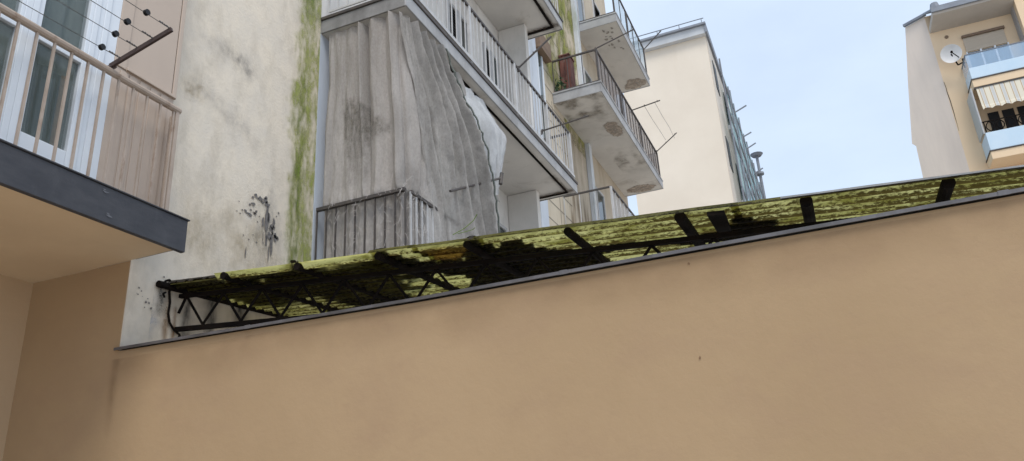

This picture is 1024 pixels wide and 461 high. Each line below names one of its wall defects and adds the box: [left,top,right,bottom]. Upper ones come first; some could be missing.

spalling [626,78,646,90]
spalling [604,122,623,136]
water stain [291,154,302,221]
spalling [627,184,656,193]
peeling [236,194,279,259]